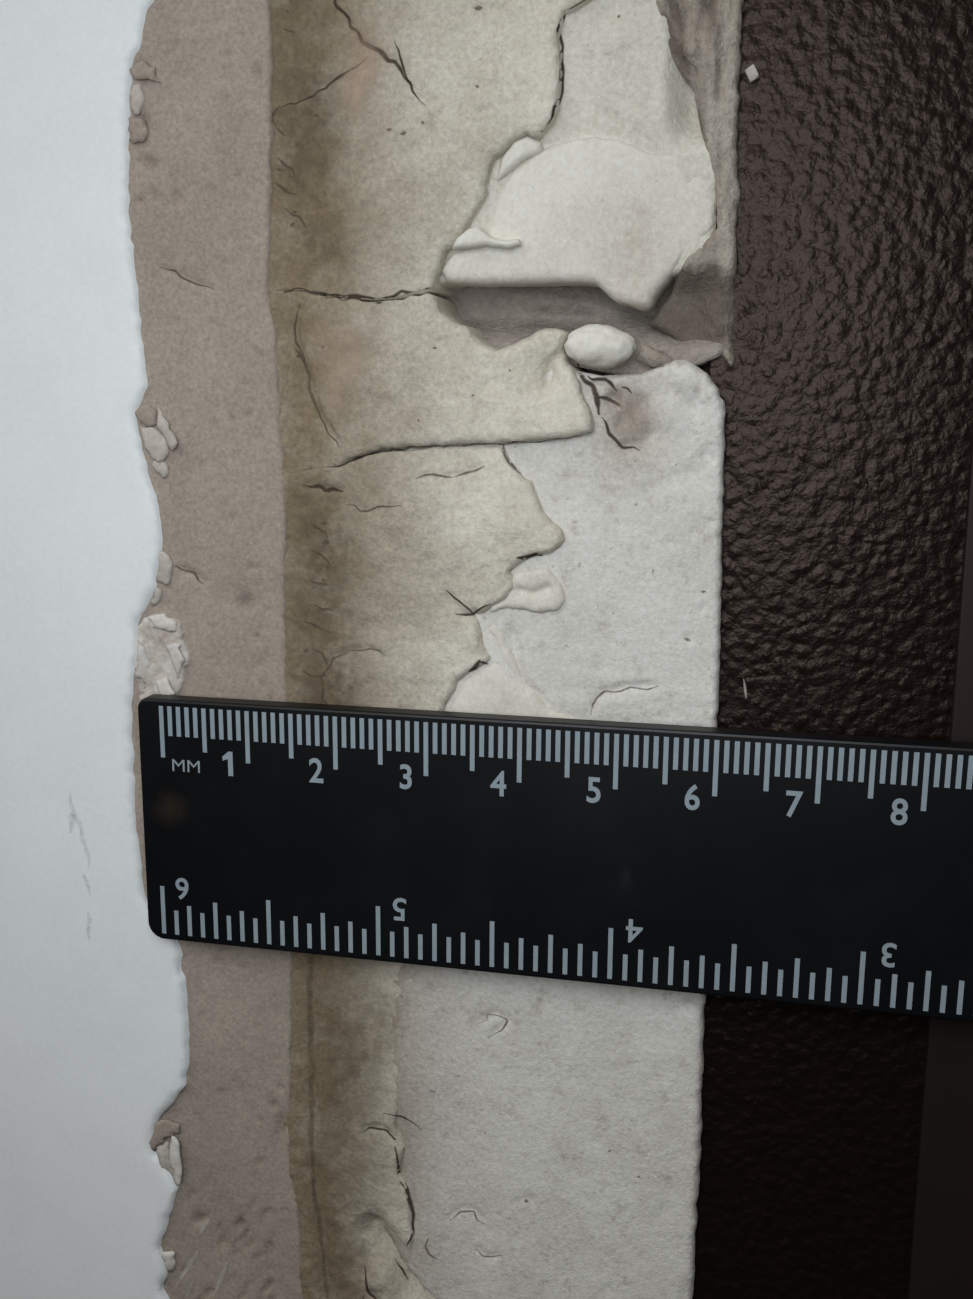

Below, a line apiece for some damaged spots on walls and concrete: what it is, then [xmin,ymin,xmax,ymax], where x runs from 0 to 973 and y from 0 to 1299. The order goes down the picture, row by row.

peeling [128,60,161,144]
crack [272,0,425,229]
peeling [497,136,543,181]
spalling [444,282,723,451]
peeling [135,404,178,478]
crack [304,485,401,512]
crack [517,552,543,560]
peeling [134,550,190,701]
crack [446,590,491,617]
crack [469,660,488,672]
peeling [149,1119,182,1186]
crack [362,1113,435,1299]